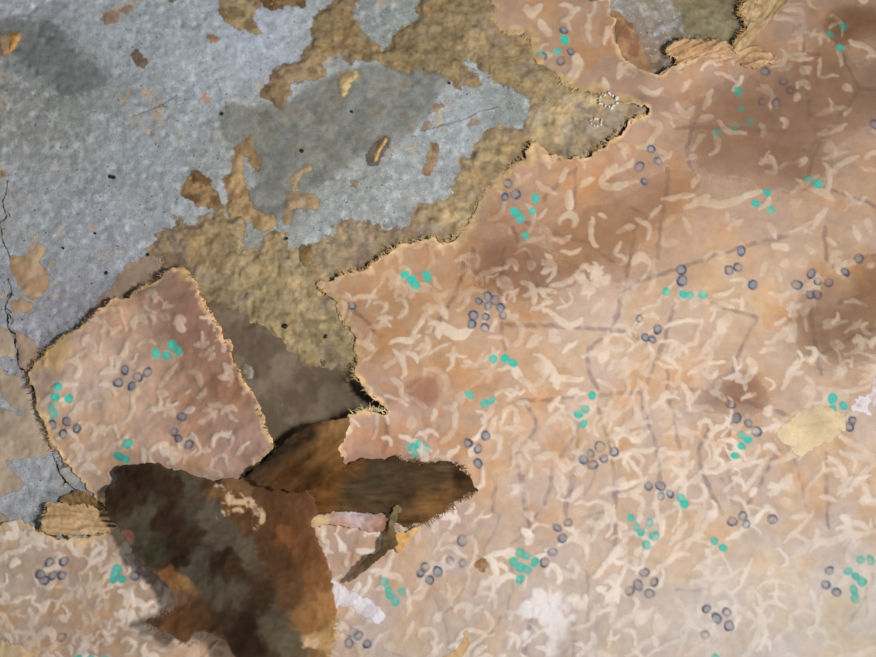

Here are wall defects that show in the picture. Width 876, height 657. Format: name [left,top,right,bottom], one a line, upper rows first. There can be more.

peeling [8,32,20,55]
spalling [365,135,391,167]
crack [0,277,34,391]